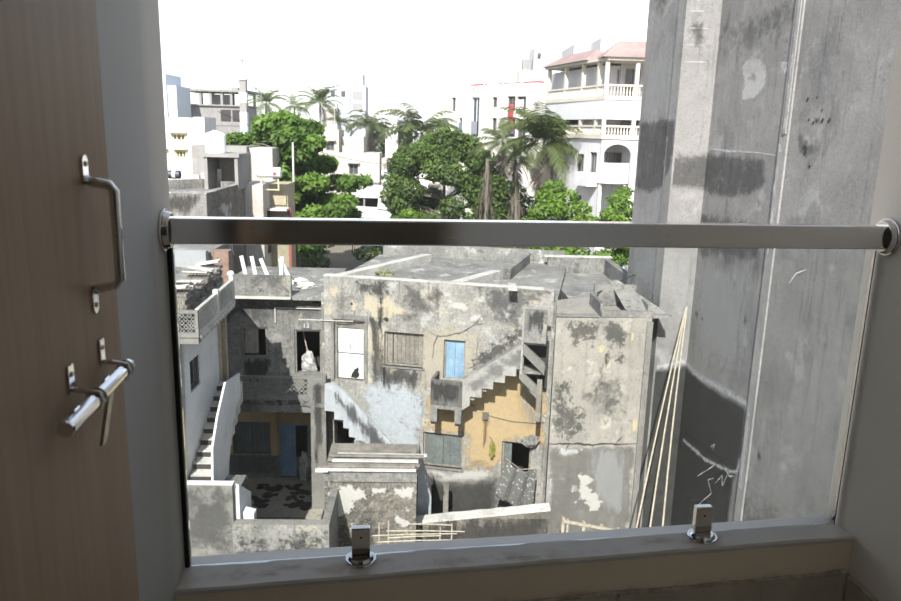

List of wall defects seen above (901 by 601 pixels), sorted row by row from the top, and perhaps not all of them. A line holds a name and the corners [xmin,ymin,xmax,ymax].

damp [636,120,774,194]
damp [410,292,441,309]
damp [356,280,418,389]
damp [568,321,626,364]
damp [545,381,585,494]
peeling [328,484,415,534]
spalling [571,472,603,512]